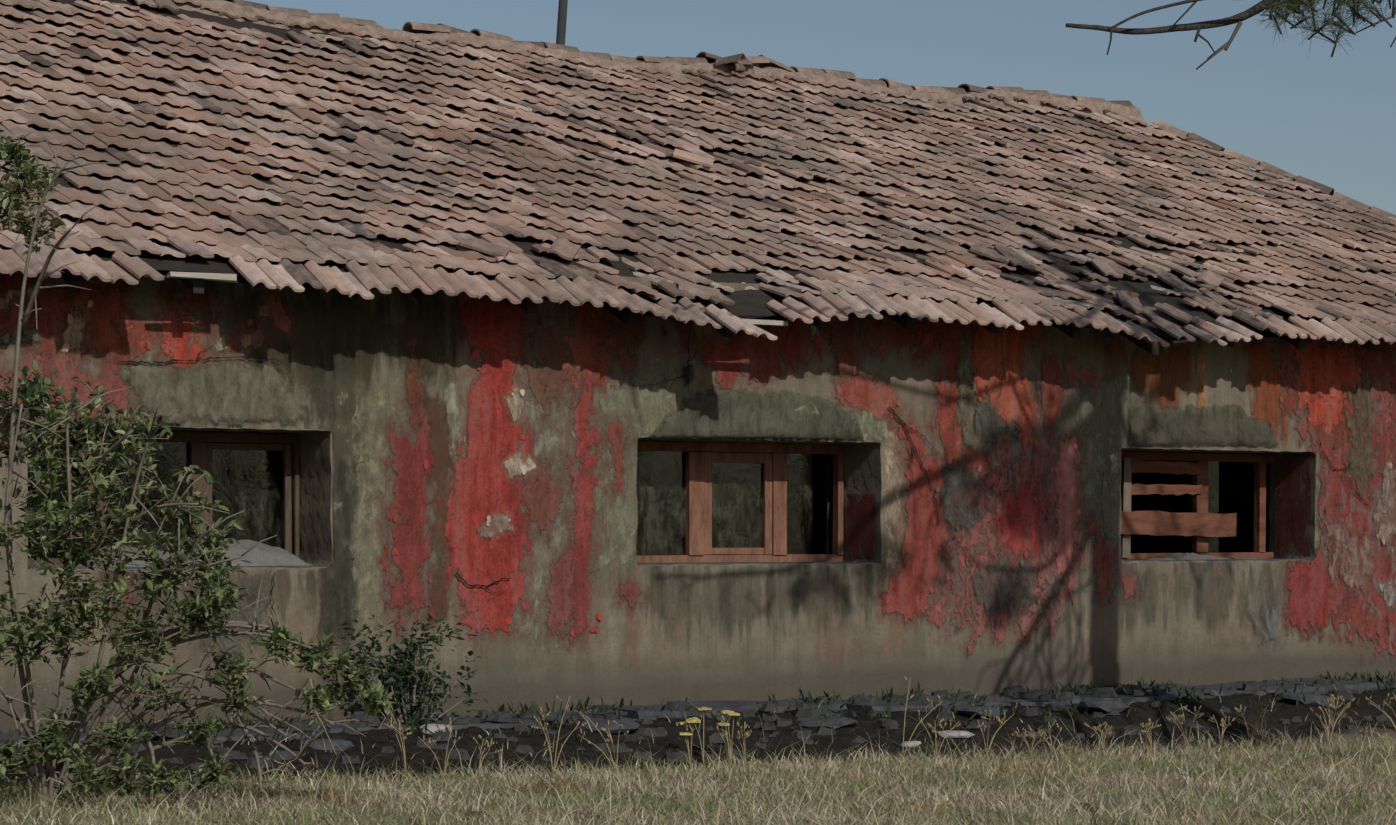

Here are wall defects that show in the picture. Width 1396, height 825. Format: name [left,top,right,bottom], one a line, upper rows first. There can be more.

peeling [0,271,293,447]
crack [456,572,511,594]
peeling [378,293,629,645]
peeling [673,315,1139,656]
peeling [1245,337,1396,658]